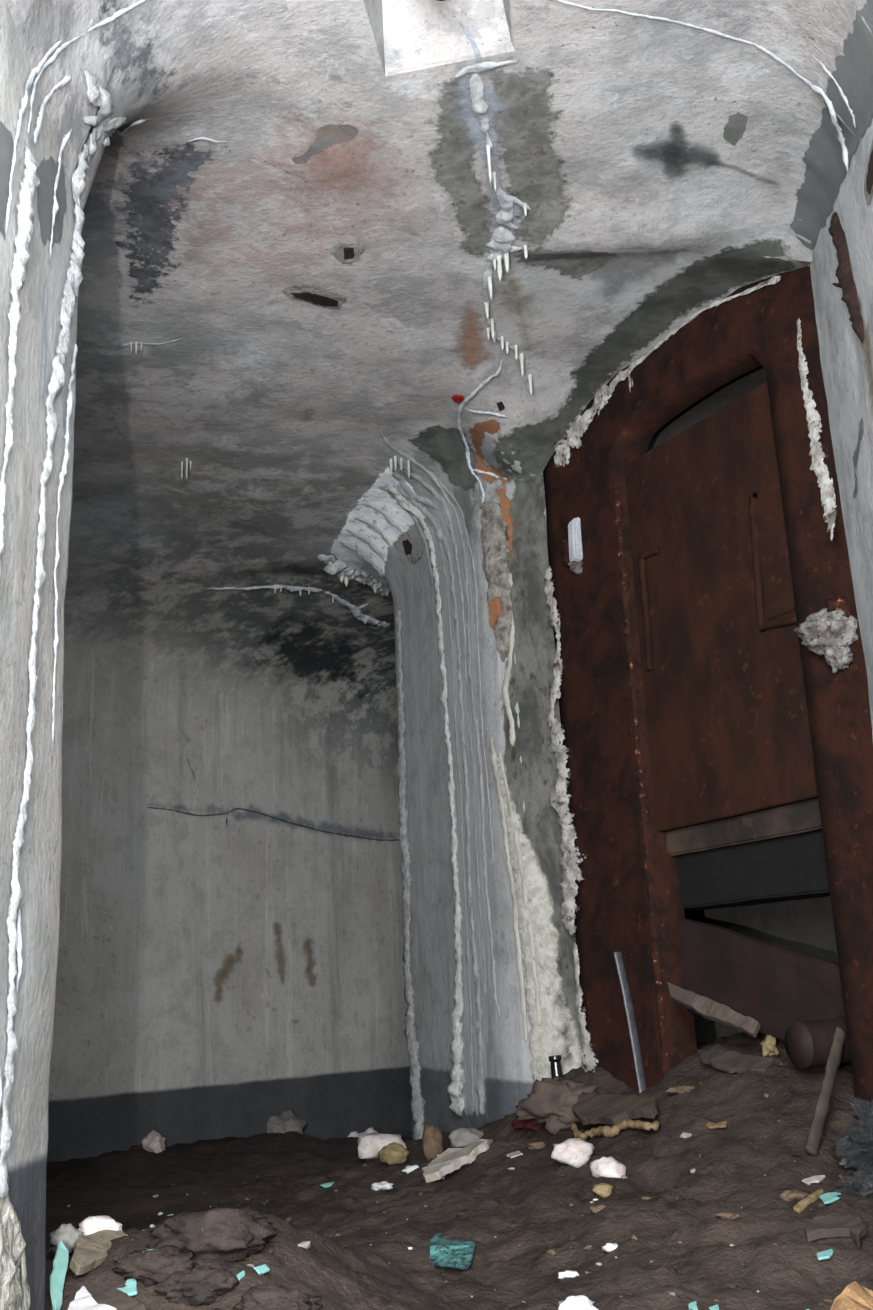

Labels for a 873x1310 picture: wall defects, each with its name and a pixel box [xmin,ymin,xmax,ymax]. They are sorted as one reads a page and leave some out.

water stain [0,35,151,1310]
crack [148,807,399,841]
spalling [283,285,346,309]
water stain [207,418,583,1140]
spalling [409,426,516,746]
water stain [429,23,675,396]
peeling [493,0,873,486]
peeling [797,318,838,543]